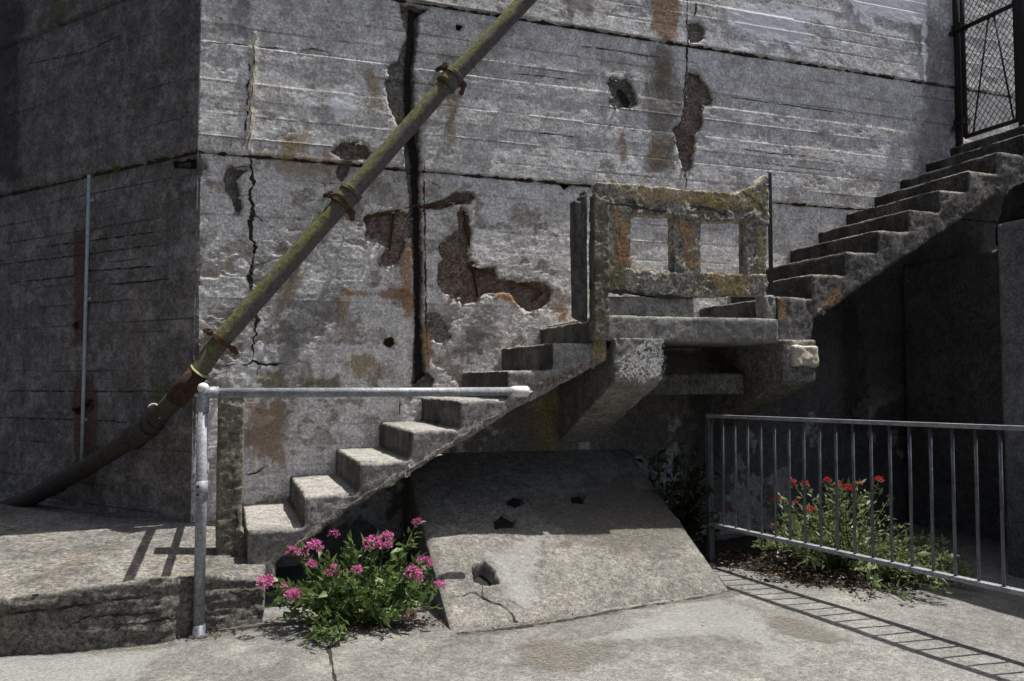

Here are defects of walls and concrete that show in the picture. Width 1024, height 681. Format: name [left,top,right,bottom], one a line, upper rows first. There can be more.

crack [212,33,329,375]
spalling [332,141,370,181]
crack [385,4,438,414]
spalling [363,191,552,312]
spalling [608,78,637,110]
crack [580,0,697,131]
corrosion [651,0,681,42]
spalling [673,73,713,173]